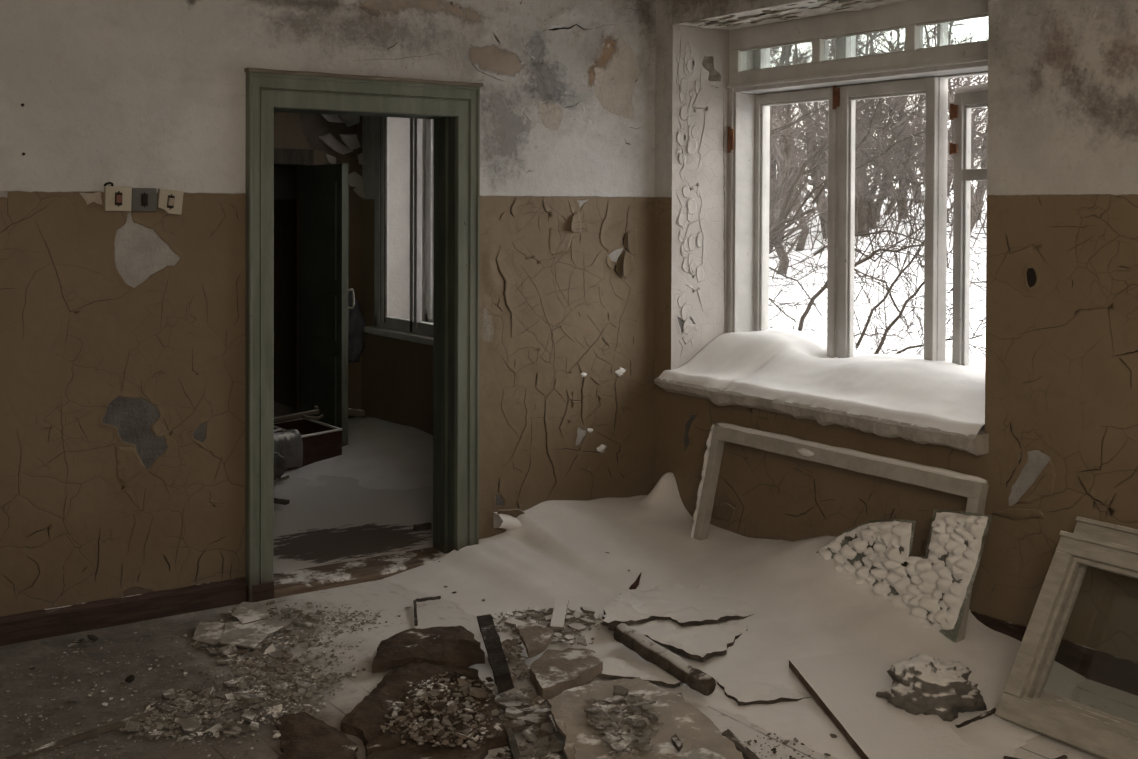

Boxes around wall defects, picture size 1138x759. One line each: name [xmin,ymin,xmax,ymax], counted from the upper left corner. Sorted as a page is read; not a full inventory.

peeling [678,0,909,30]
spalling [584,36,643,122]
peeling [676,44,724,164]
peeling [109,211,186,294]
peeling [571,195,592,233]
peeling [599,228,637,278]
peeling [677,185,704,282]
crack [495,112,637,501]
peeling [674,295,698,345]